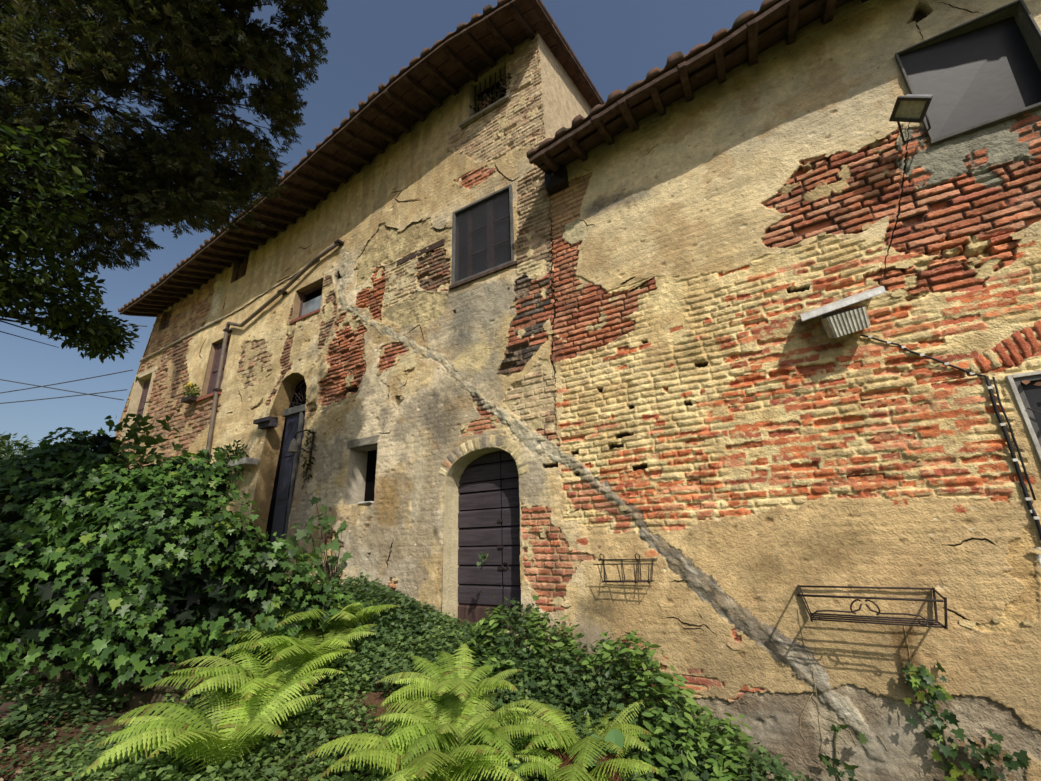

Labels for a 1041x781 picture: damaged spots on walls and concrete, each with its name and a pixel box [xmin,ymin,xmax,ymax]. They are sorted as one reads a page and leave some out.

crack [915,0,984,40]
flaking render [446,31,546,189]
crack [356,189,446,259]
crack [879,122,910,287]
flaking render [306,216,456,419]
flaking render [459,113,1041,534]
flaking render [521,505,597,612]
crack [943,535,998,546]
crack [943,607,982,625]